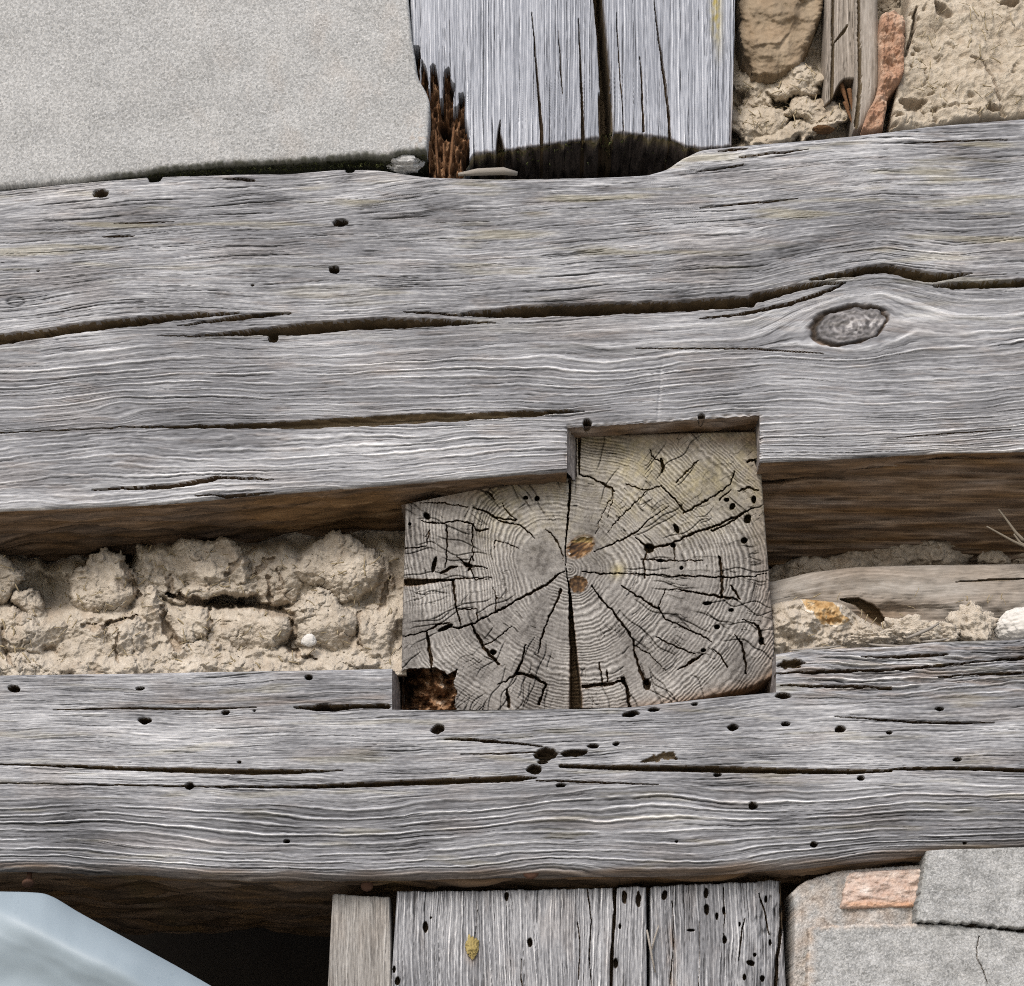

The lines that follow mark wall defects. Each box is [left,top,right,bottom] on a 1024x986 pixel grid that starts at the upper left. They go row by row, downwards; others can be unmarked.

crack [531,0,671,179]
crack [0,265,1024,345]
crack [0,409,579,434]
crack [356,440,765,708]
crack [0,737,1024,790]